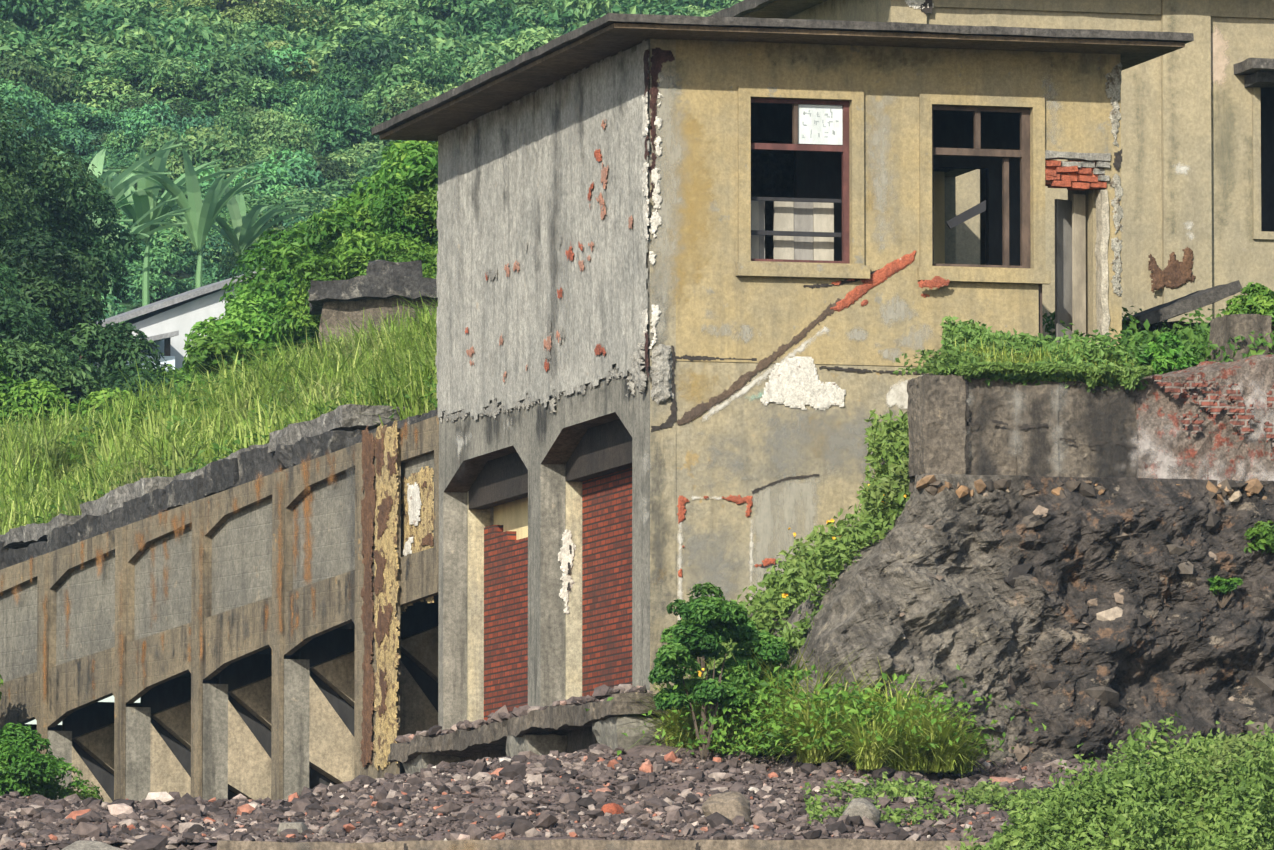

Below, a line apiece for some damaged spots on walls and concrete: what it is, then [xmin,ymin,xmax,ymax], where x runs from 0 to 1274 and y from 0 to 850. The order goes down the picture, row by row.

spalling [628,47,675,266]
damp [538,202,557,282]
crack [803,269,879,289]
flaking render [830,251,916,312]
rust [1148,247,1196,293]
damp [537,406,550,435]
spalling [440,305,661,423]
flaking render [760,355,846,410]
crack [819,366,923,375]
flaking render [1152,373,1274,460]
rust [265,462,315,631]
peeling [360,418,434,770]